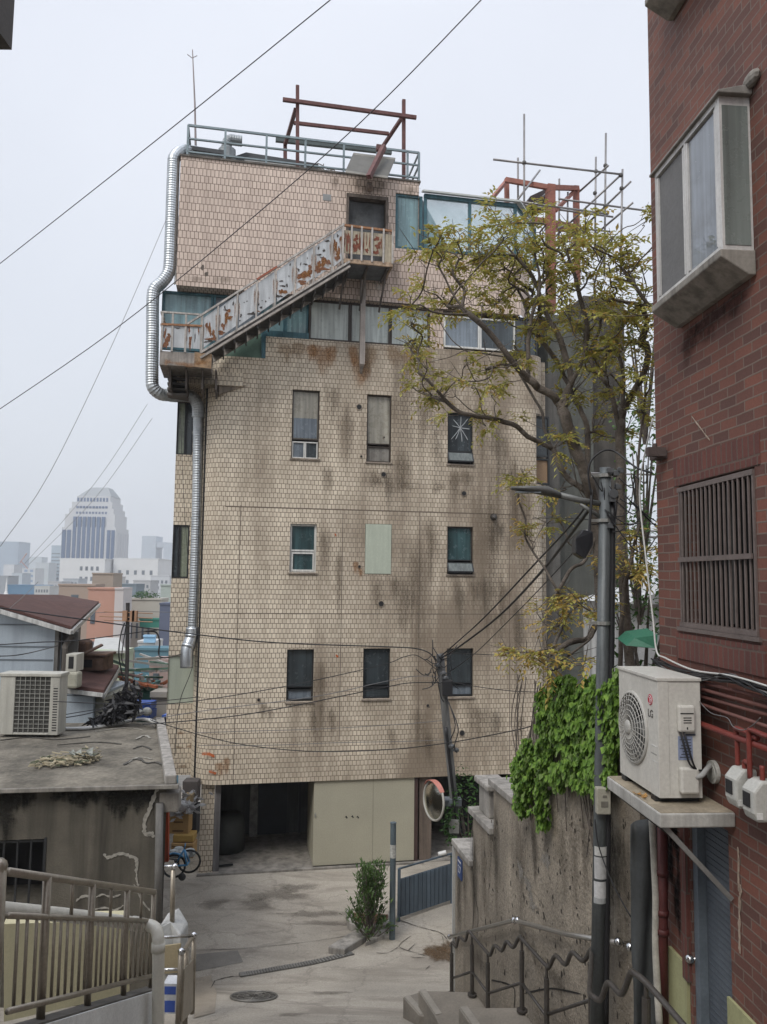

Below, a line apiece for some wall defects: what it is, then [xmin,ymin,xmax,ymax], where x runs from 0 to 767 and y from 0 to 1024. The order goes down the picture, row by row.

leakage [0,793,37,842]
crack [0,727,162,911]
leakage [50,790,155,818]